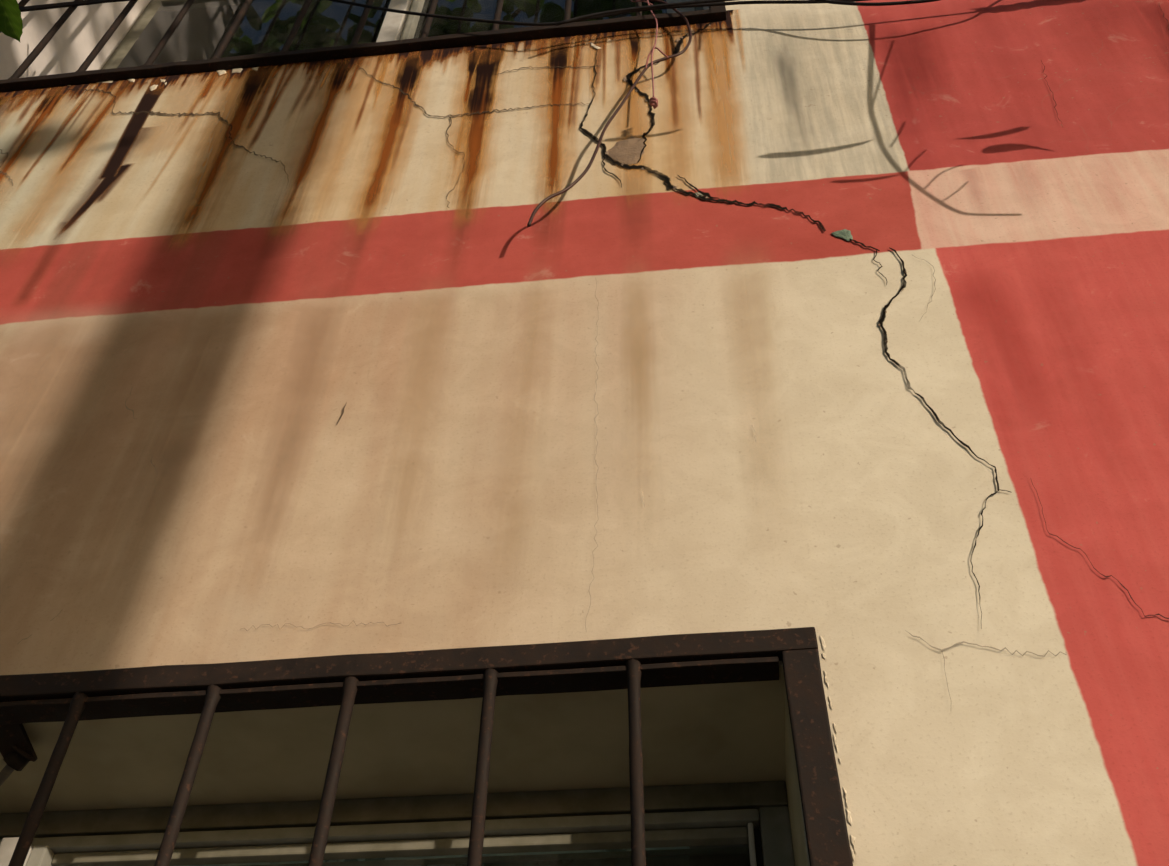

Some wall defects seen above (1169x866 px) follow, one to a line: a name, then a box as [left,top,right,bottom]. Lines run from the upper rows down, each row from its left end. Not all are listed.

rust [0,10,736,232]
crack [358,11,1169,699]